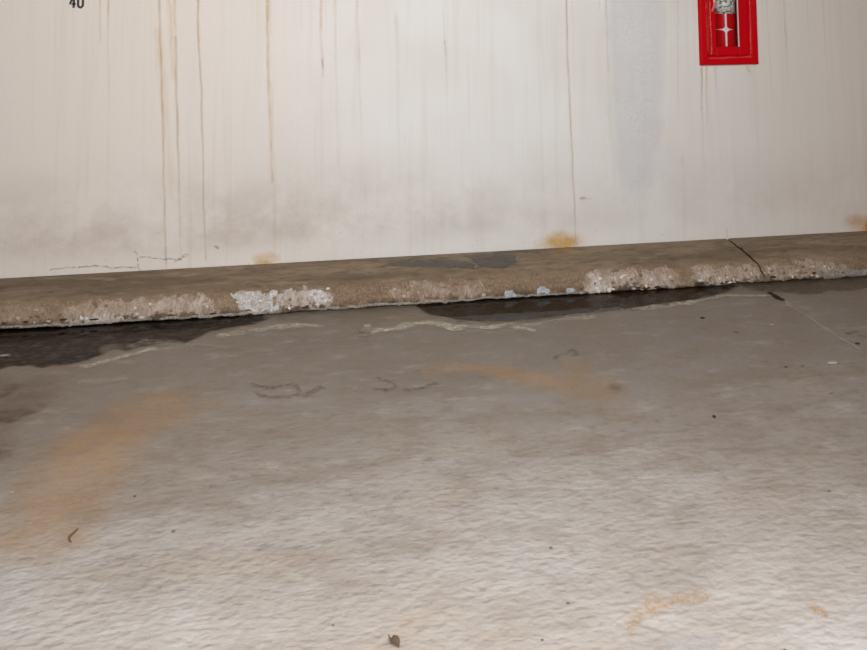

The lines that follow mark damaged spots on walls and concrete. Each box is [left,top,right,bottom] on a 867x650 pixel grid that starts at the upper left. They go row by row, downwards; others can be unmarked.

crack [727,239,788,305]
damp [354,276,867,338]
damp [0,314,322,368]